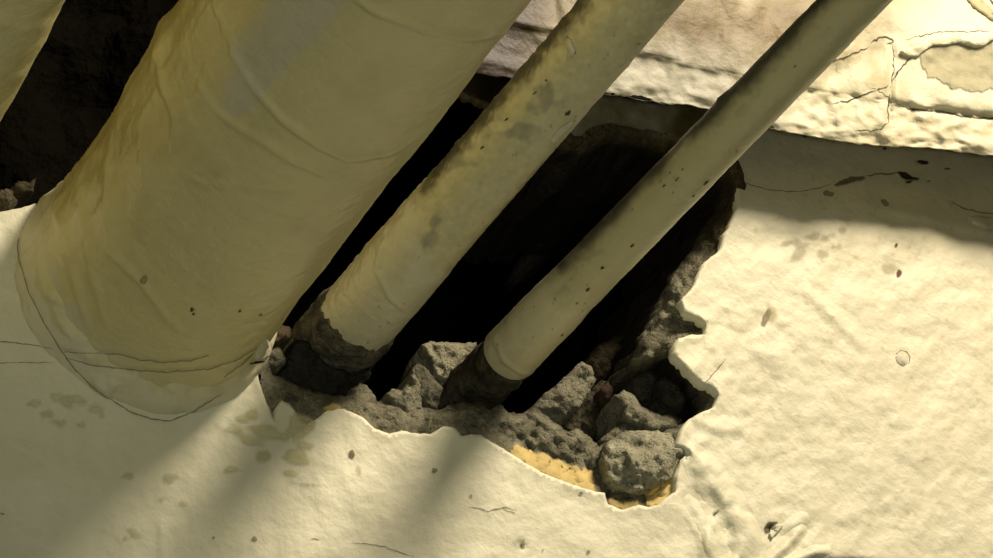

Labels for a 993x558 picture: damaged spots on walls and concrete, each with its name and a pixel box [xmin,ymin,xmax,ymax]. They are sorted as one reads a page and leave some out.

peeling [967,0,993,21]
crack [833,30,993,132]
peeling [900,34,993,92]
spalling [463,111,684,264]
spalling [594,160,746,439]
water stain [228,410,314,475]
spalling [249,337,673,510]